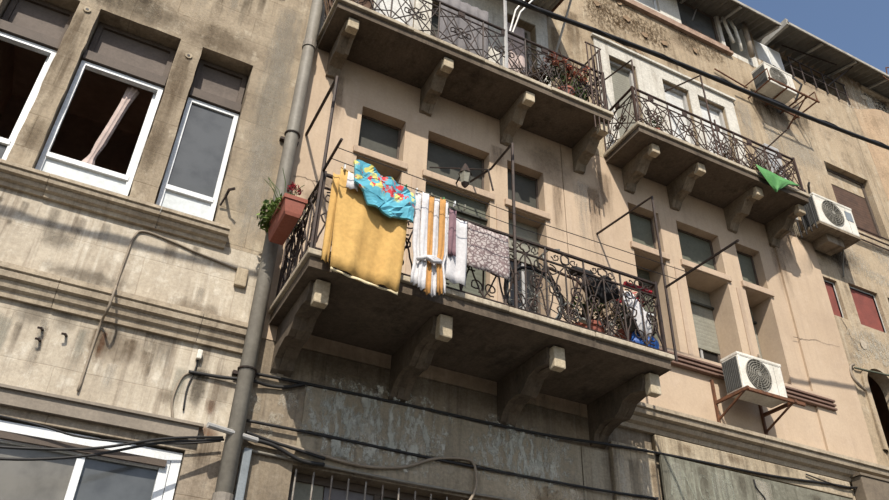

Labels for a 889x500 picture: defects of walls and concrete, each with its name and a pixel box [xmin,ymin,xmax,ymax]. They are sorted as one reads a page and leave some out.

spalling [587,0,670,50]
peeling [302,379,452,472]
peeling [470,422,579,500]